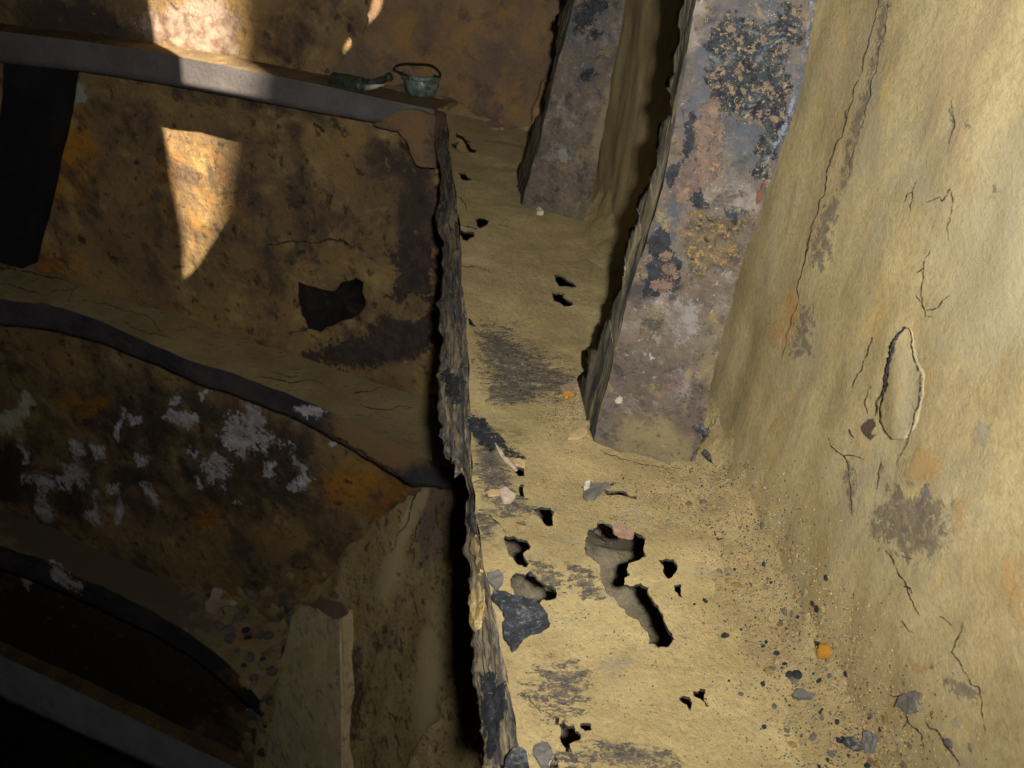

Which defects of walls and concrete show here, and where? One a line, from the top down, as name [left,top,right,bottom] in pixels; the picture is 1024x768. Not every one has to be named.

crack [782,1,889,356]
crack [904,182,954,317]
spalling [298,278,366,332]
water stain [0,389,124,526]
water stain [113,406,144,443]
water stain [133,452,162,507]
water stain [161,390,212,431]
water stain [183,402,316,505]
water stain [293,405,328,420]
crack [828,337,882,510]
water stain [868,464,955,566]
crack [886,550,986,734]